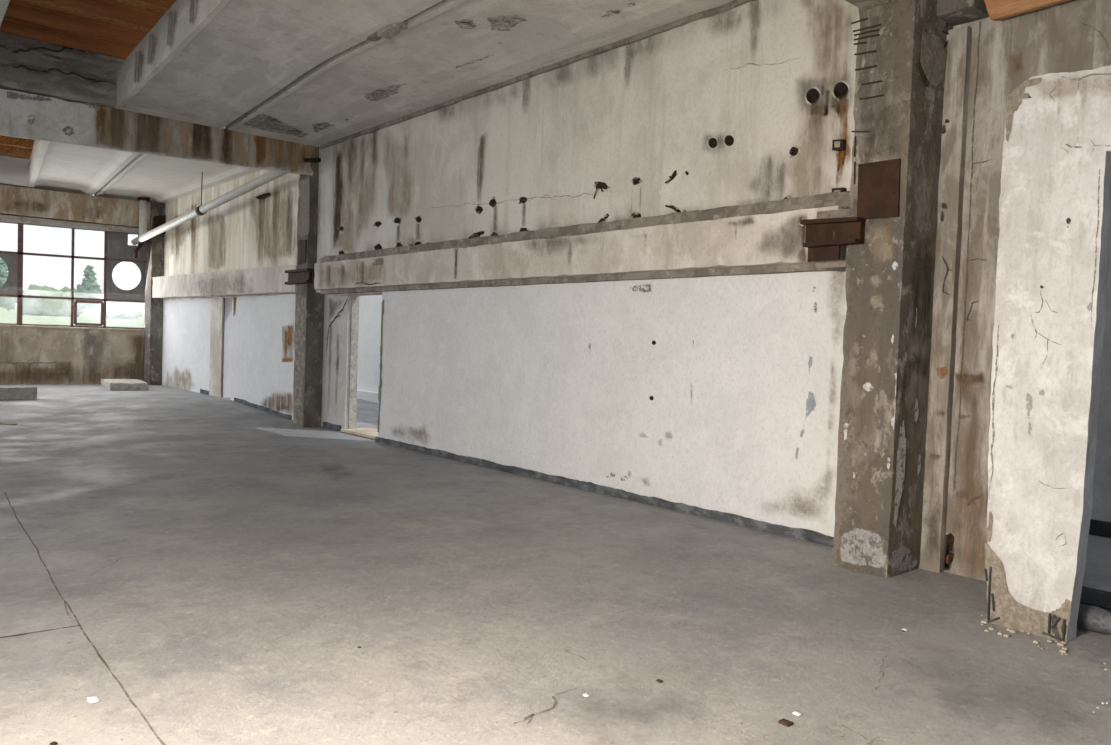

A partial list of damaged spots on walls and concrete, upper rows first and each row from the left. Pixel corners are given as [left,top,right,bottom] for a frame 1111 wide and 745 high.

crack [11,46,117,85]
damp [100,108,333,172]
corrosion [837,100,848,169]
spalling [1005,78,1042,141]
damp [336,133,409,249]
damp [0,336,145,383]
spalling [840,528,917,571]
spalling [984,511,1071,642]